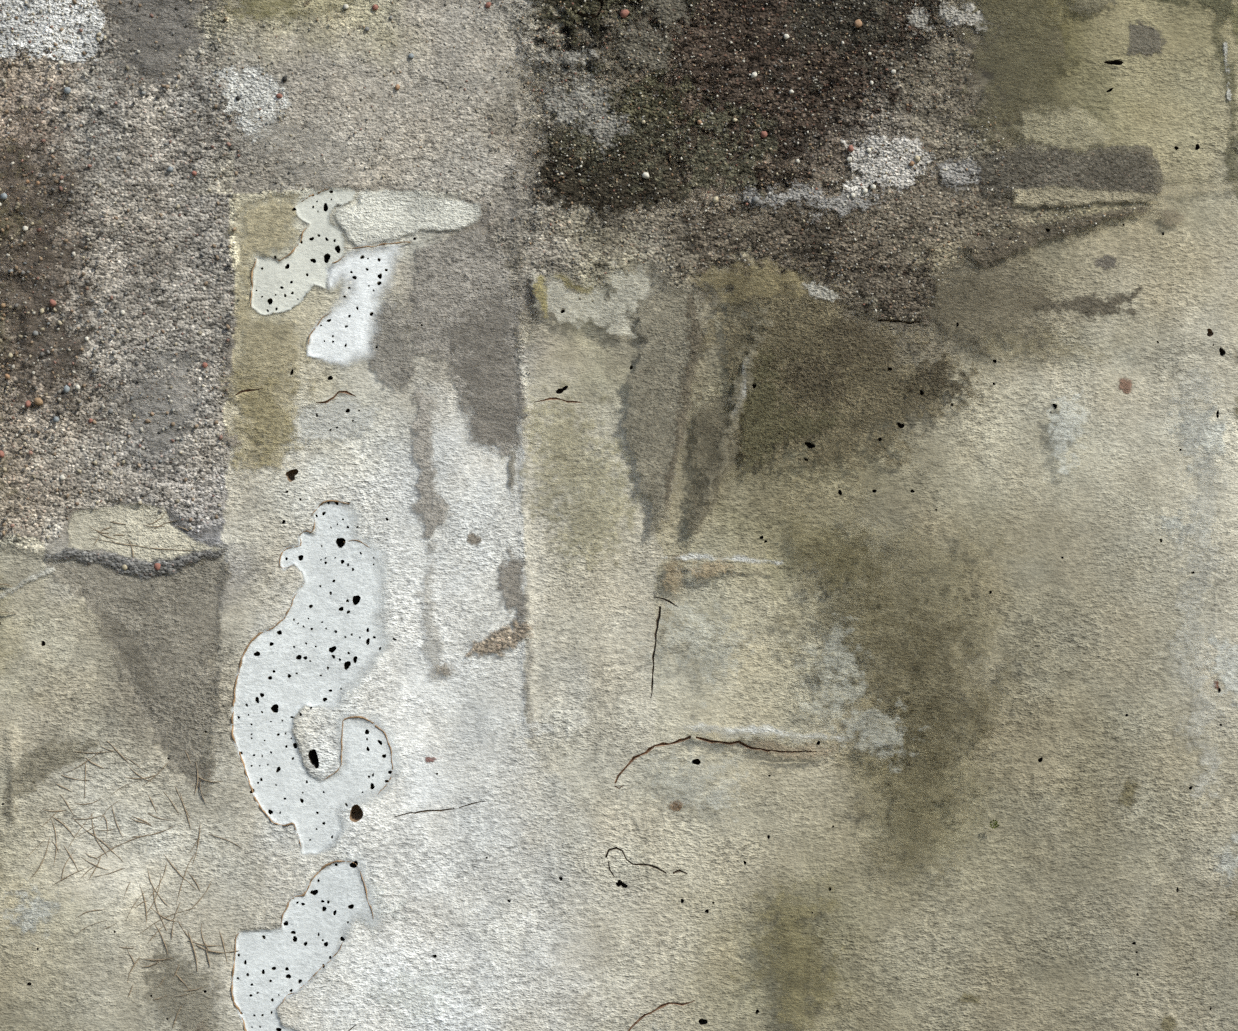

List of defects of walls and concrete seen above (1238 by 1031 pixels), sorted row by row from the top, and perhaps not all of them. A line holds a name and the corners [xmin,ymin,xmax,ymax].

leakage [1213,0,1238,195]
leakage [369,225,526,537]
spalling [0,0,1142,579]
leakage [513,0,1184,535]
leakage [467,533,481,545]
leakage [665,553,782,564]
peeling [230,500,397,1031]
crack [614,735,817,789]